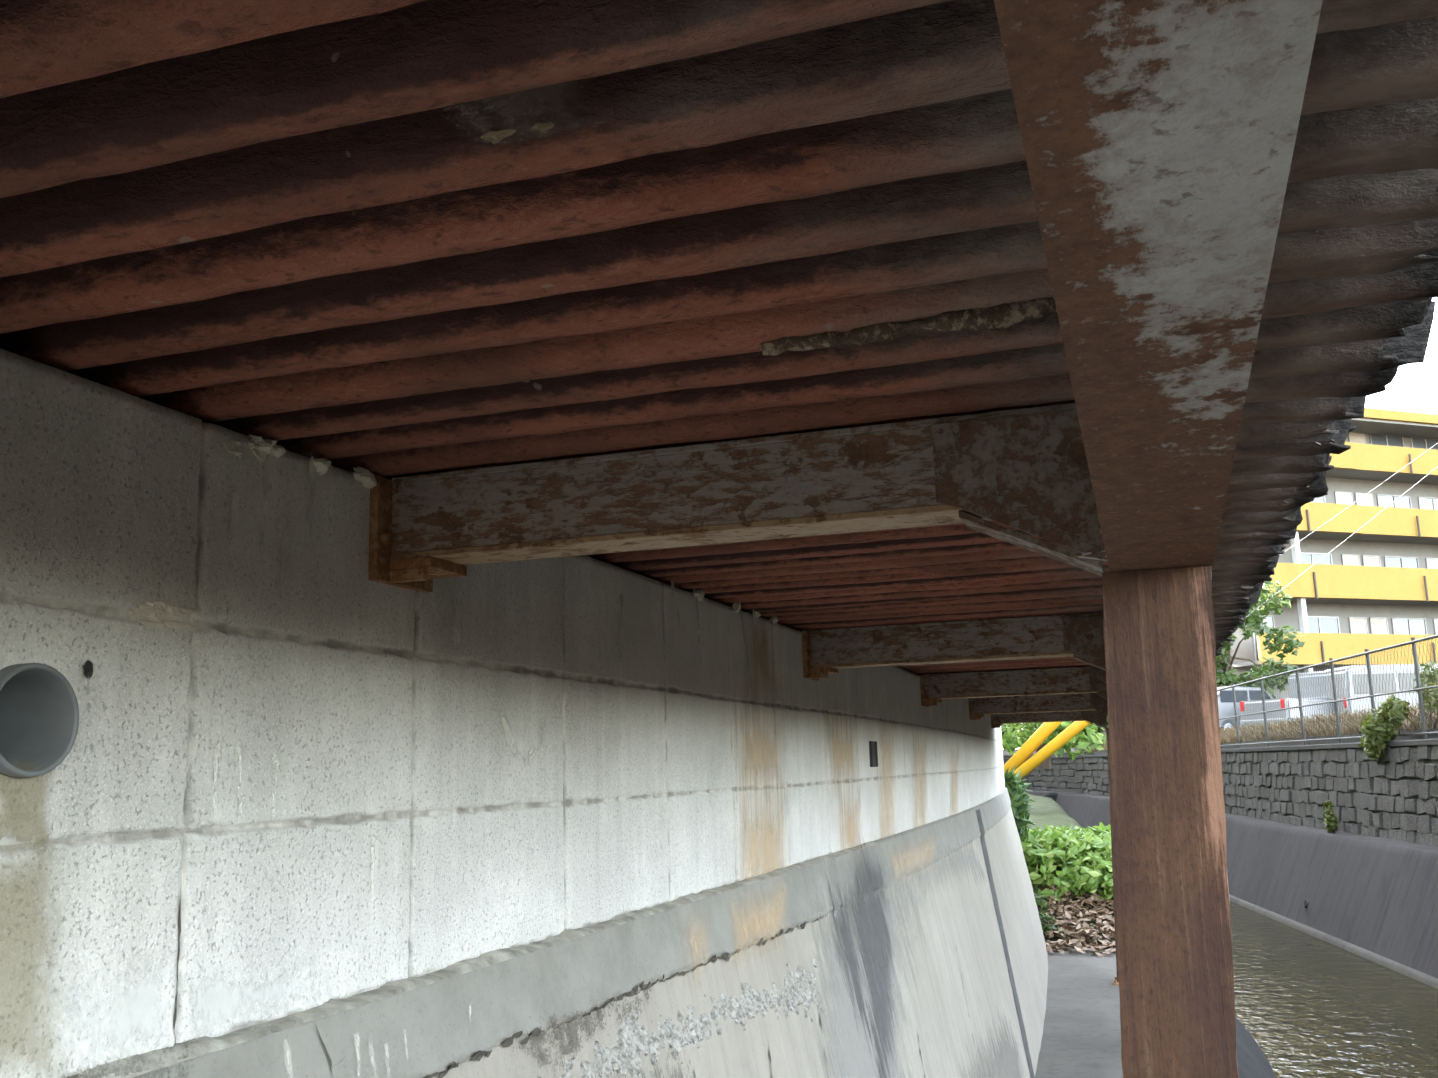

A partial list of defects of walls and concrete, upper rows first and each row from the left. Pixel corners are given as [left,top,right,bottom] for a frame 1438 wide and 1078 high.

peeling [761,298,1057,356]
leakage [0,775,43,842]
leakage [0,879,39,1050]
spalling [562,956,825,1078]
leakage [817,839,983,1078]